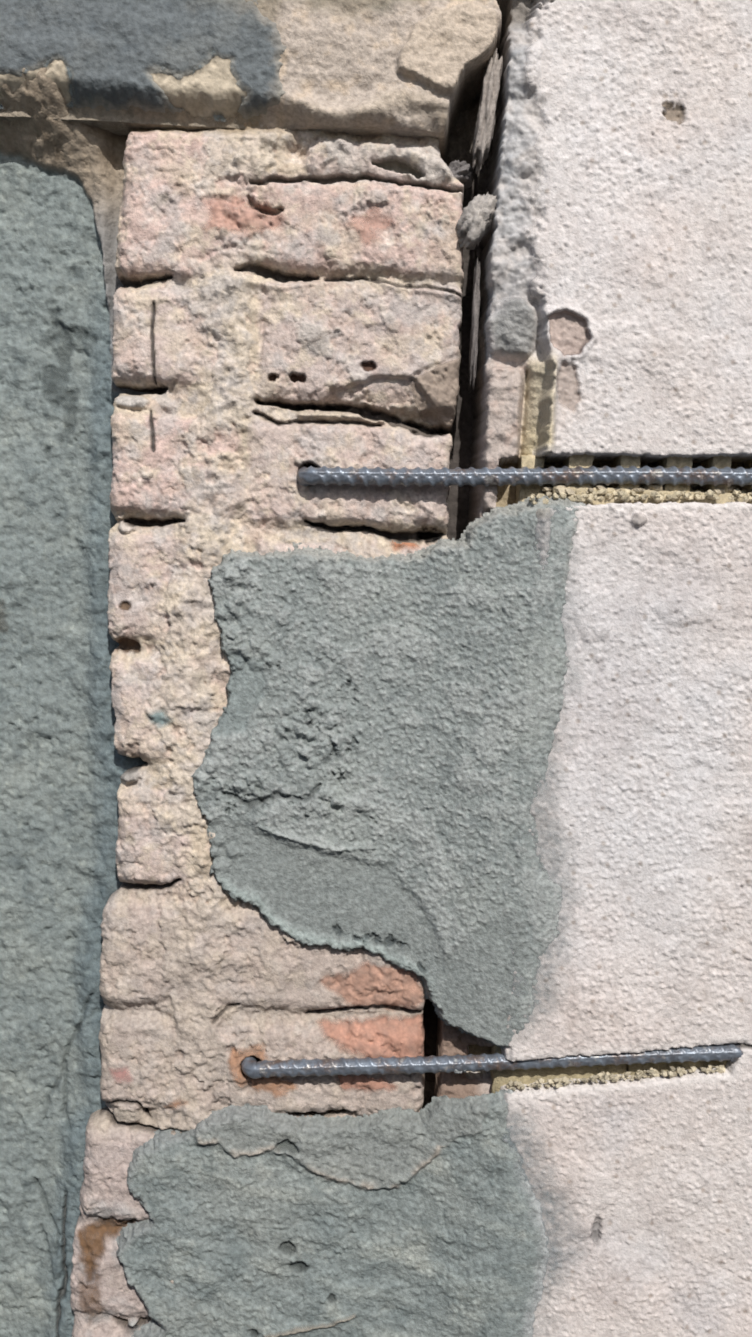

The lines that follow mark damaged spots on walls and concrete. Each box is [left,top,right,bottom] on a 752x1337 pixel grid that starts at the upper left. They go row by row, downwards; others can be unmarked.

spalling [372,160,424,179]
spalling [475,21,544,315]
spalling [210,197,281,230]
spalling [548,311,590,410]
spalling [269,374,306,383]
spalling [412,359,460,434]
spalling [117,638,140,653]
spalling [333,926,395,946]
spalling [275,1139,298,1152]
crack [57,1195,68,1337]
spalling [281,1241,306,1270]